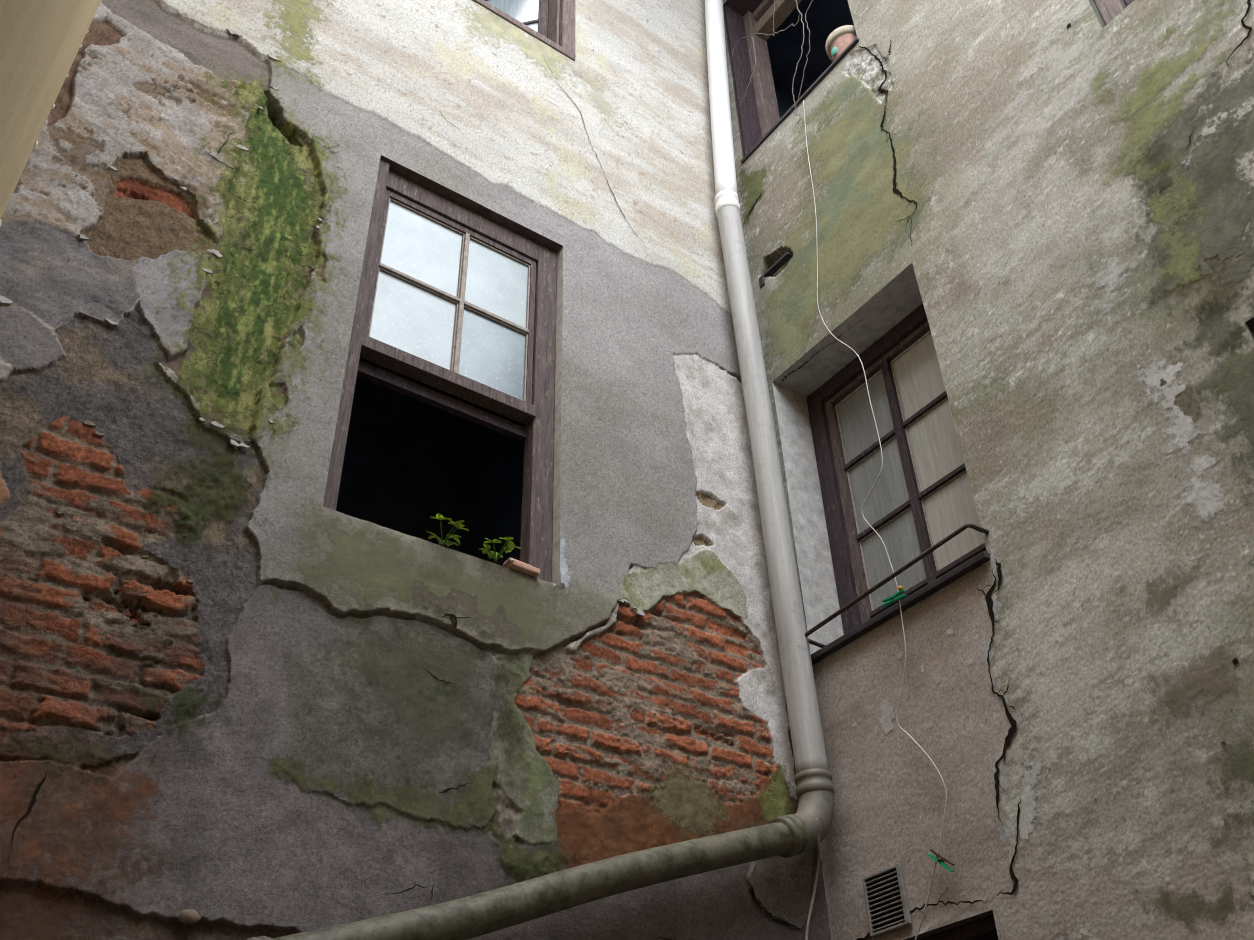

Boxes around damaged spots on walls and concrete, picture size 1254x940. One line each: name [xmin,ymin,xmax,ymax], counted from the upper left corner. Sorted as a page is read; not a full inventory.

crack [1226,0,1252,76]
crack [854,40,917,246]
leakage [1143,158,1220,300]
leakage [1199,94,1254,144]
leakage [1236,148,1254,194]
peeling [0,0,303,768]
spalling [293,326,305,352]
spalling [503,557,540,578]
spalling [514,352,798,813]
crack [910,559,1021,921]